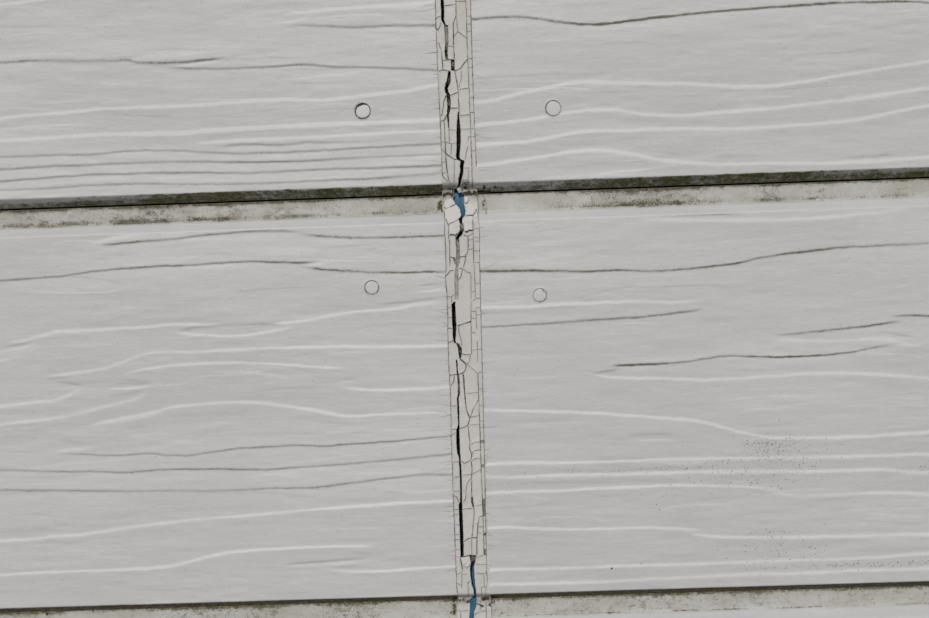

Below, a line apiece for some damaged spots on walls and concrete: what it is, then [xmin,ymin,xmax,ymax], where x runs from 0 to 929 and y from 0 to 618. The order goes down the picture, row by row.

crack [432,0,477,189]
peeling [444,187,476,235]
crack [439,210,488,592]